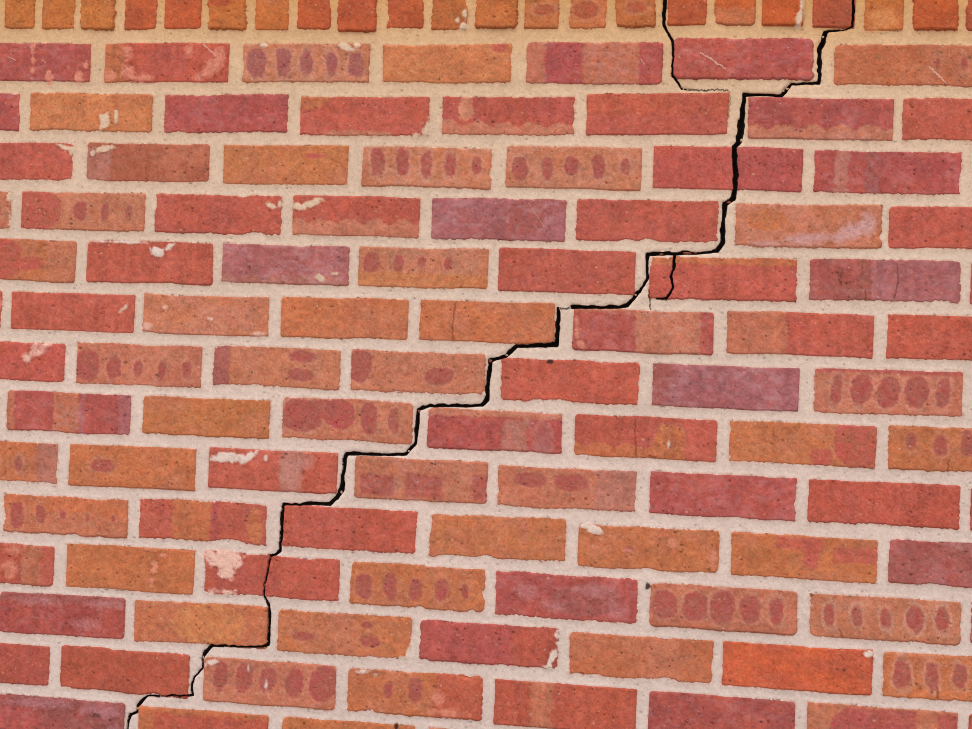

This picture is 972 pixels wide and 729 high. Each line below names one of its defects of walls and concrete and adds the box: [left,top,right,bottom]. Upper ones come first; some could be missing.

crack [127,0,855,729]